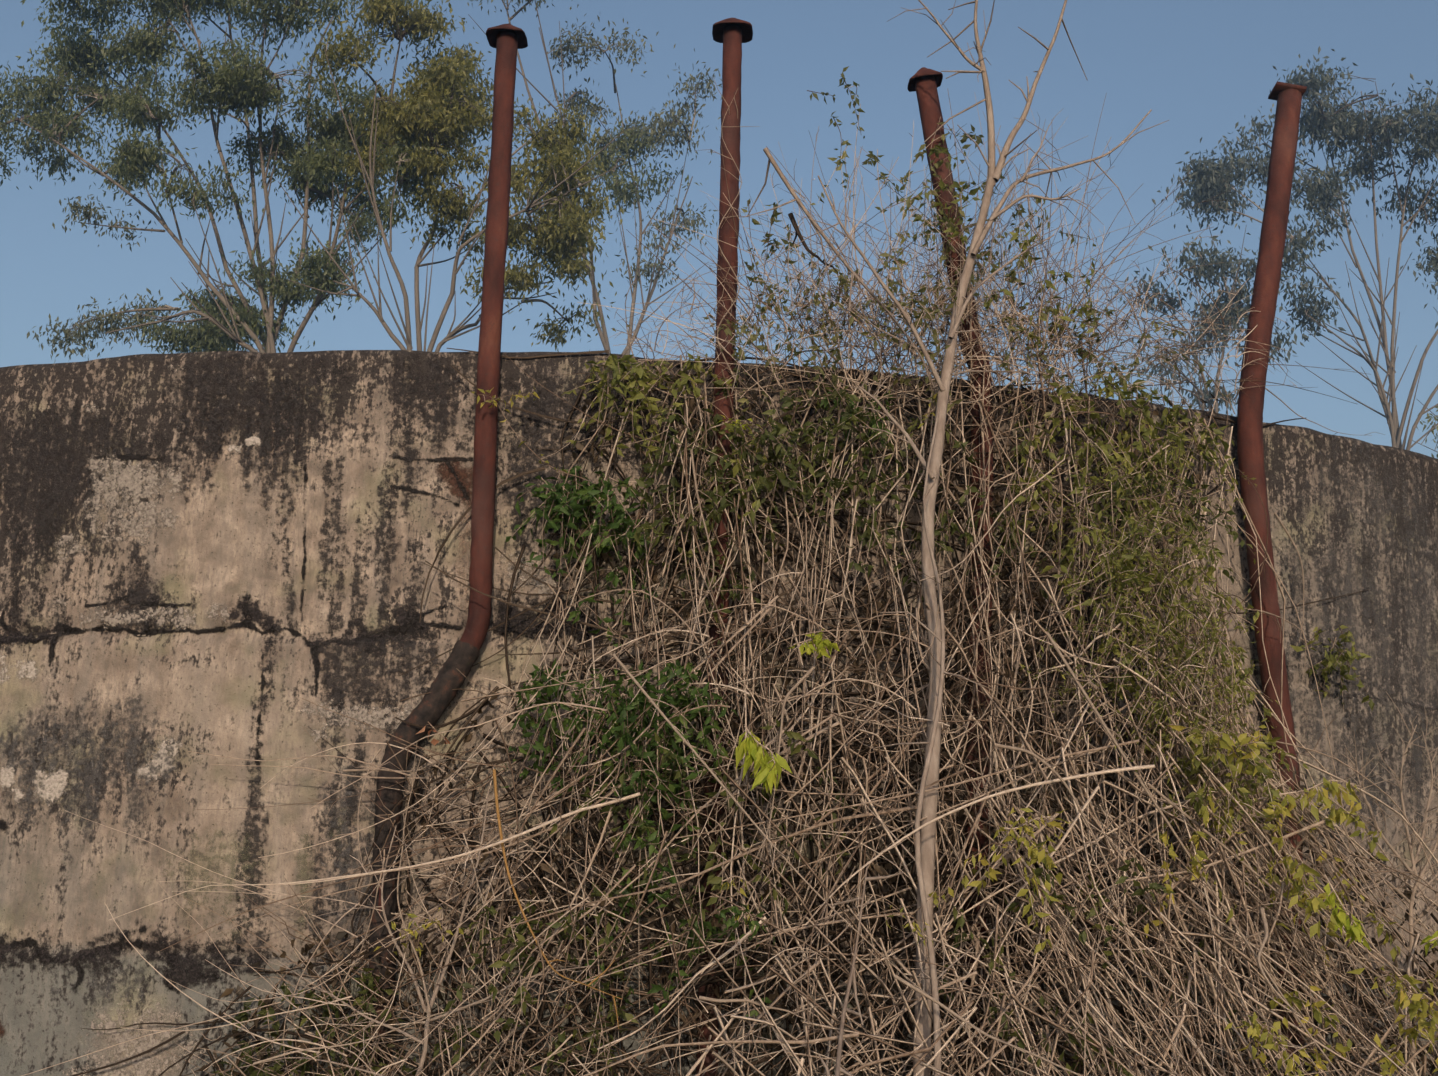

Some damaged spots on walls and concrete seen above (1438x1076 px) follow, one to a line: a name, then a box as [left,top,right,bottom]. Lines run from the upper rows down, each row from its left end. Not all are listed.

water stain [0,354,350,967]
crack [0,464,615,765]
water stain [296,353,474,968]
water stain [1270,435,1438,871]
water stain [89,960,146,1010]